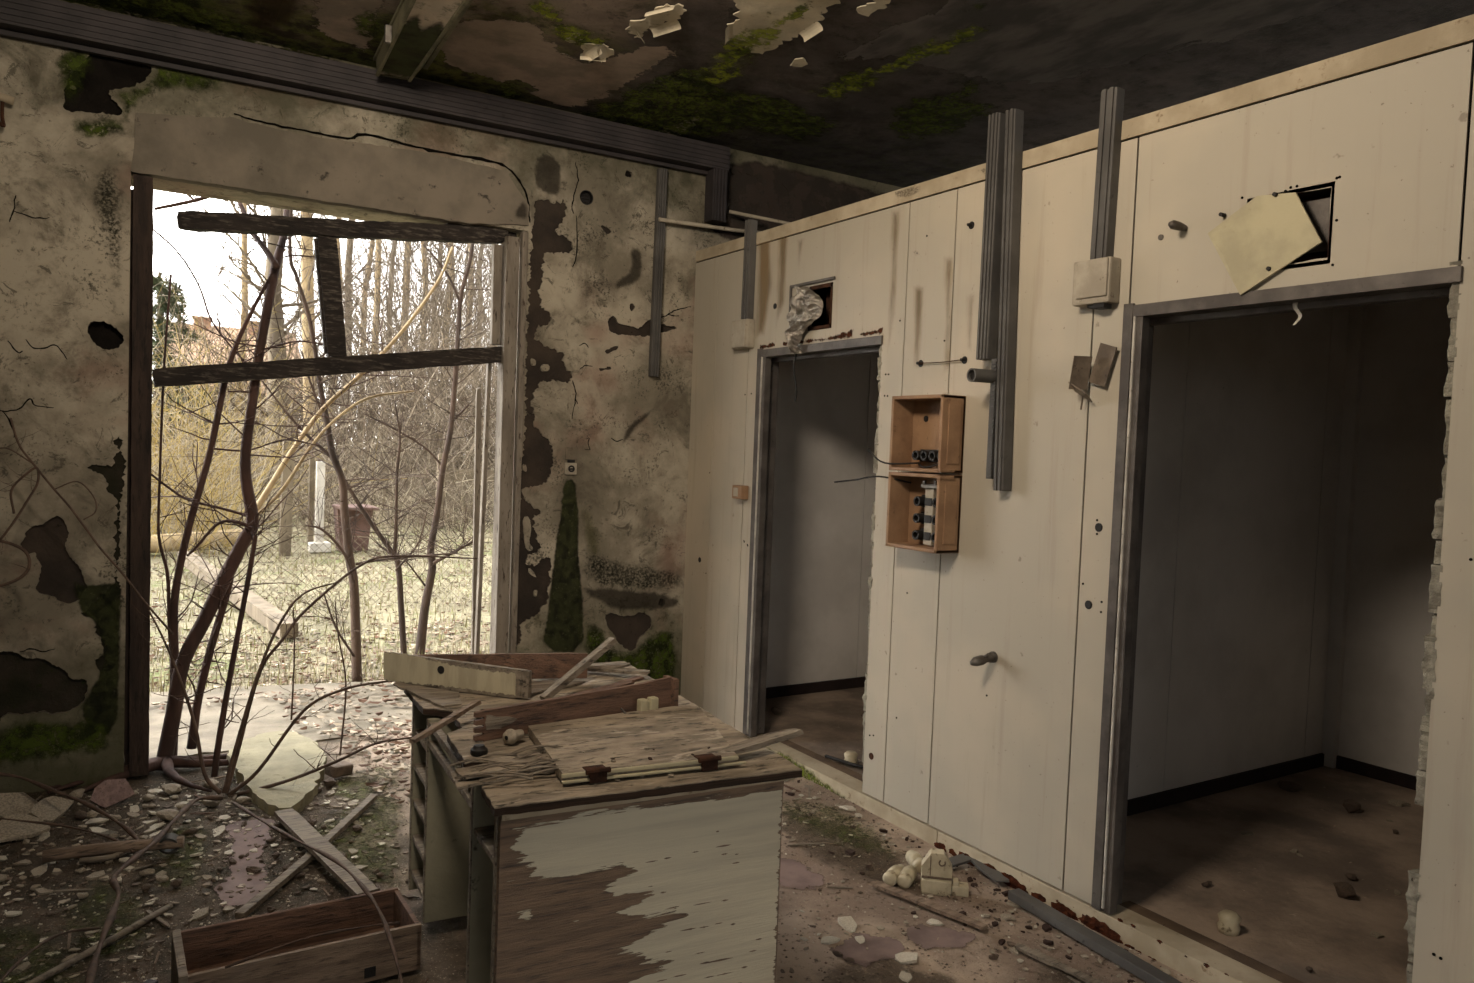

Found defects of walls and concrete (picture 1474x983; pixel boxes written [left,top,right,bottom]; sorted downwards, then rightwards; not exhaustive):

flaking render [63,54,152,116]
peeling [311,0,386,51]
peeling [441,3,687,107]
peeling [725,0,891,67]
crack [234,113,531,222]
crack [571,162,579,267]
flaking render [599,303,676,371]
peeling [516,197,573,649]
flaking render [87,437,127,589]
flaking render [0,516,120,721]
corrosion [934,842,1163,961]